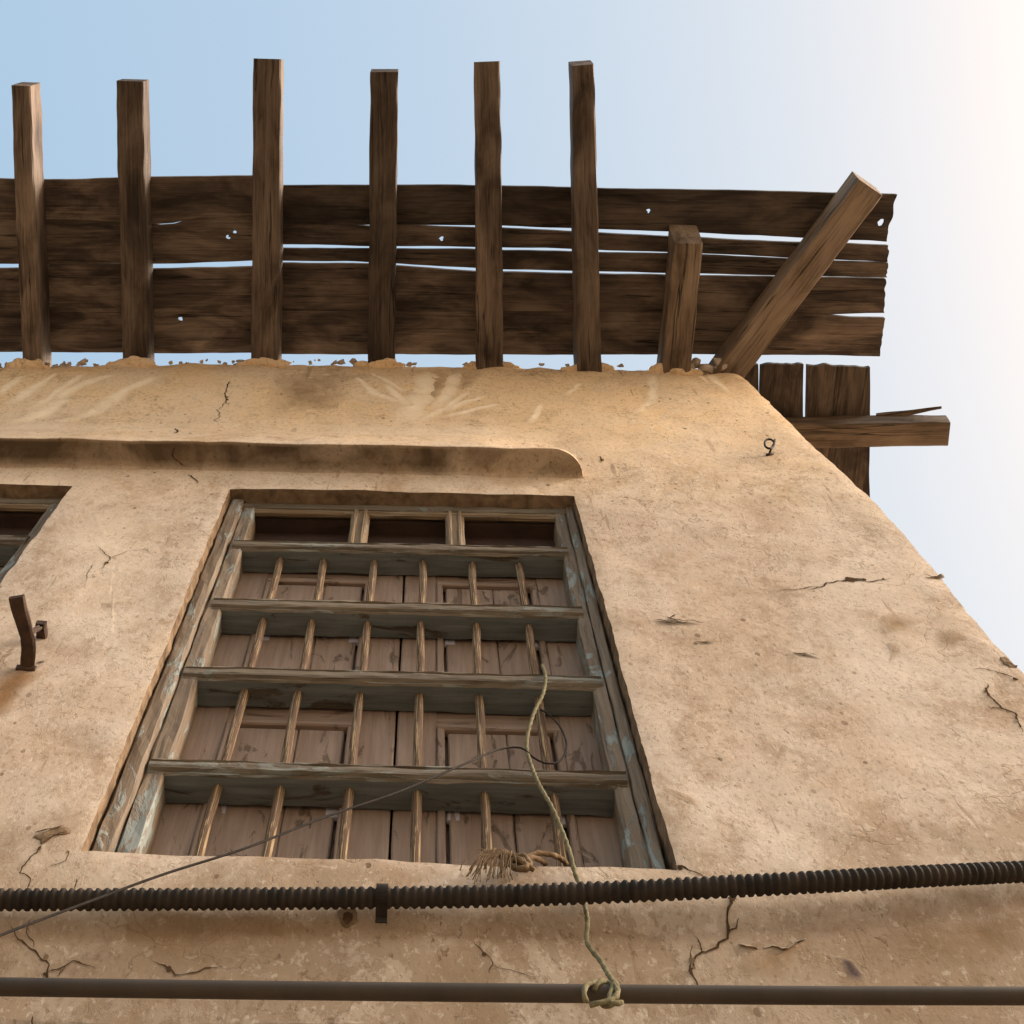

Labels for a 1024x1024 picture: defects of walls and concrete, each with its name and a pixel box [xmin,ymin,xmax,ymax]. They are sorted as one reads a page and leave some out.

crack [780,576,889,591]
crack [976,668,1023,730]
flaking render [33,825,71,844]
crack [19,844,77,889]
crack [11,919,97,978]
crack [153,961,222,976]
crack [689,870,739,985]